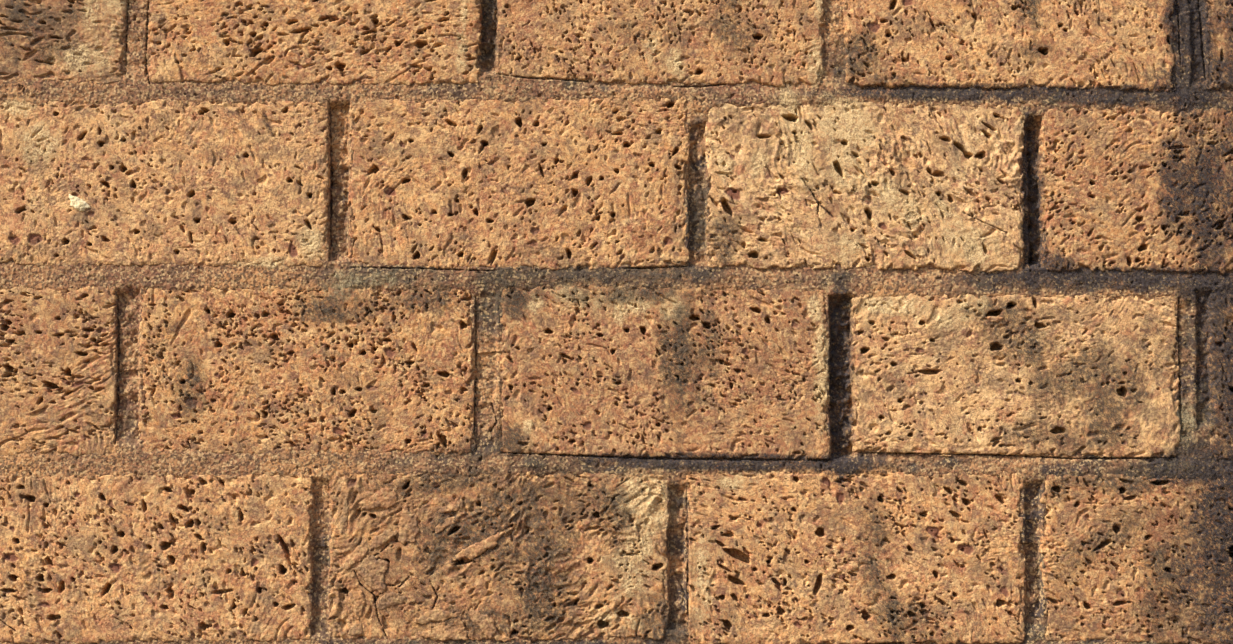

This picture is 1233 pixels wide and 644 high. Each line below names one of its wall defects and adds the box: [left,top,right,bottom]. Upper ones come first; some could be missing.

water stain [391,0,1233,644]